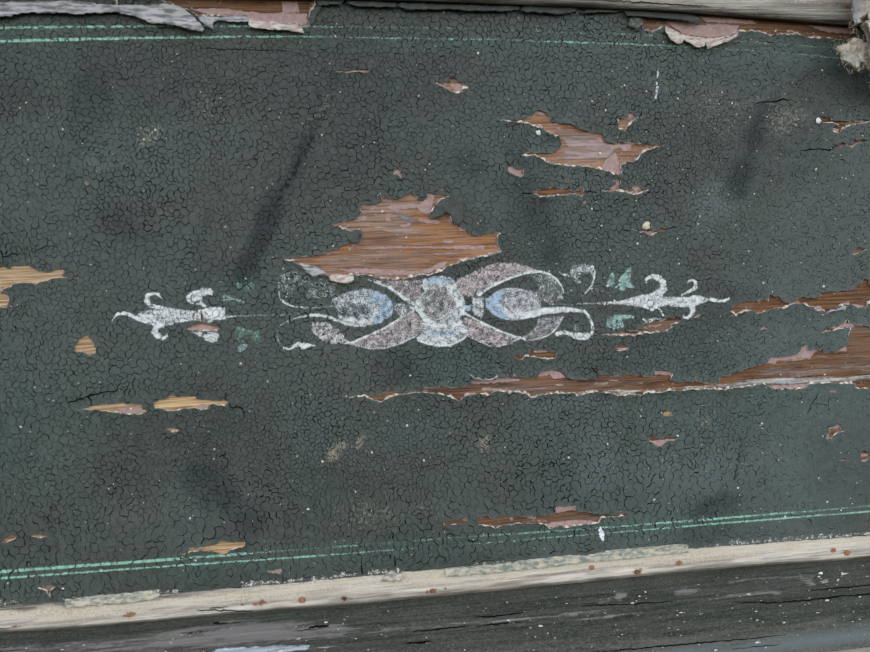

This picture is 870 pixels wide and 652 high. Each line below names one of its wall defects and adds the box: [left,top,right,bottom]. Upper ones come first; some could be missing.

crack [59,0,159,8]
peeling [0,0,519,34]
crack [604,0,710,8]
peeling [579,9,861,49]
crack [738,35,870,120]
peeling [501,110,663,195]
crack [802,133,854,170]
peeling [284,192,502,283]
crack [834,306,870,322]
peeling [346,279,870,402]
peeling [77,394,229,415]
crack [793,385,843,417]